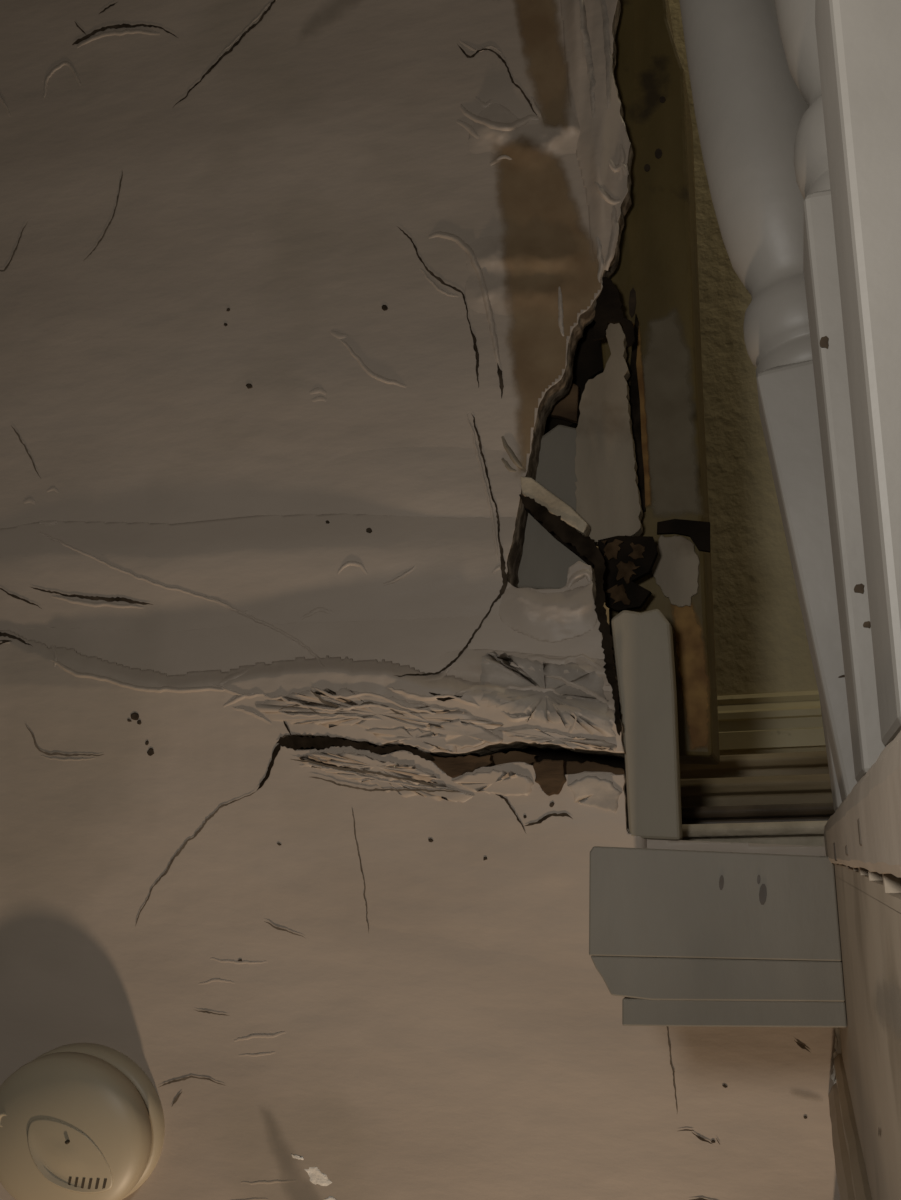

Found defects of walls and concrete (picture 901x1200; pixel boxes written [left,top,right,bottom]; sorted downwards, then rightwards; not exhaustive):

crack [174,0,276,106]
spalling [544,277,635,435]
crack [394,227,508,681]
crack [135,720,626,932]
spalling [292,749,475,803]
peeling [291,1154,336,1200]